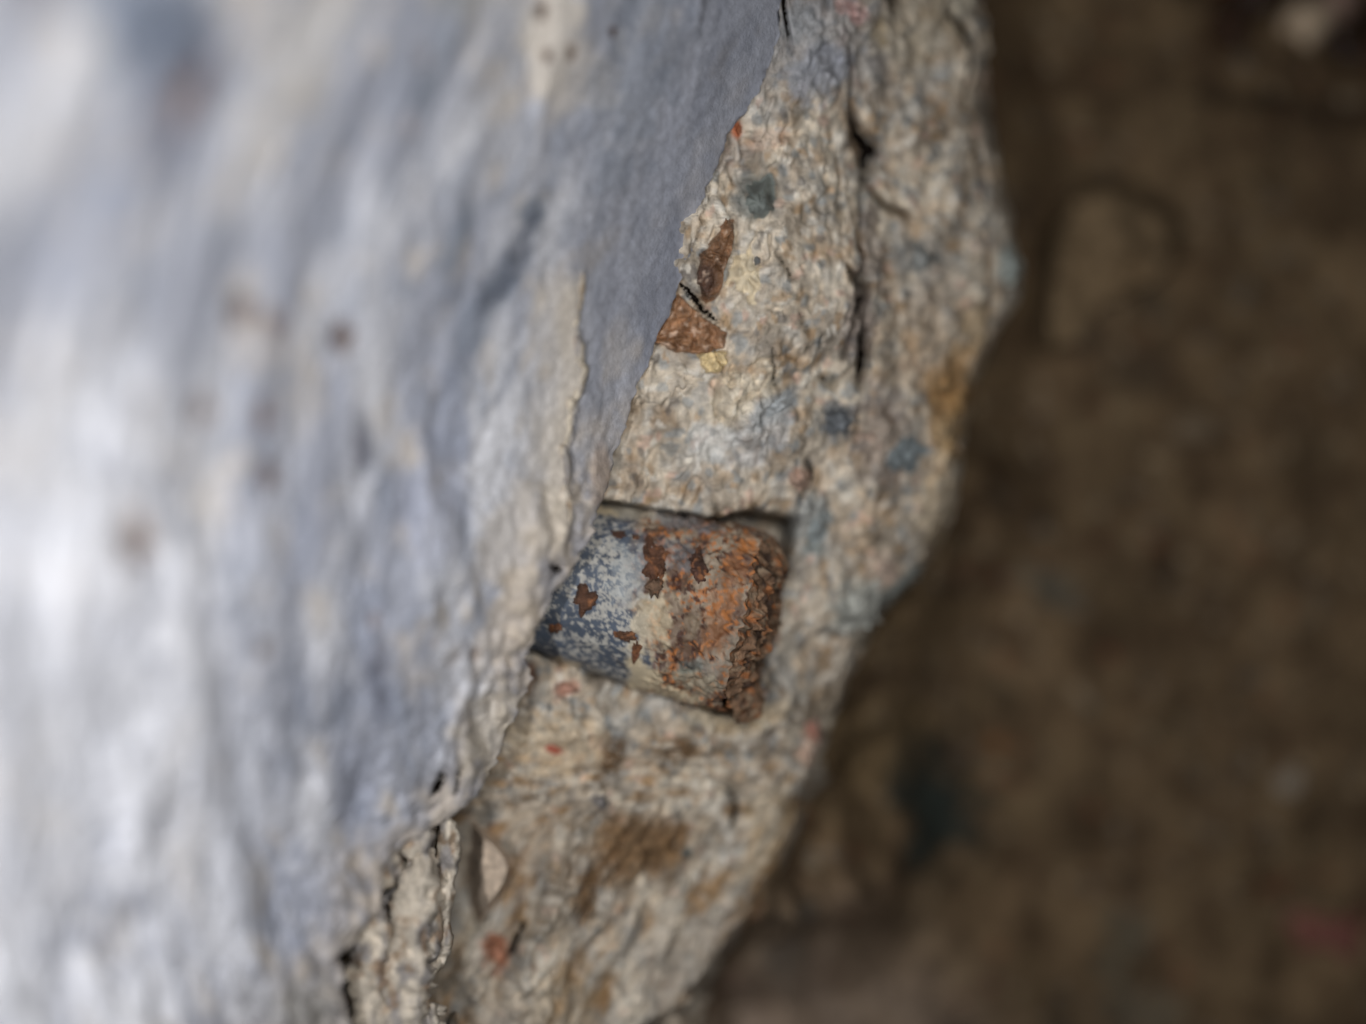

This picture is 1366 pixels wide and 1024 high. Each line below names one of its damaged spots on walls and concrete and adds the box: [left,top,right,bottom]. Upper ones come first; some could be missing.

crack [772,104,907,388]
spalling [334,0,1023,1024]
crack [550,565,562,573]
crack [432,771,461,796]
crack [485,877,527,954]